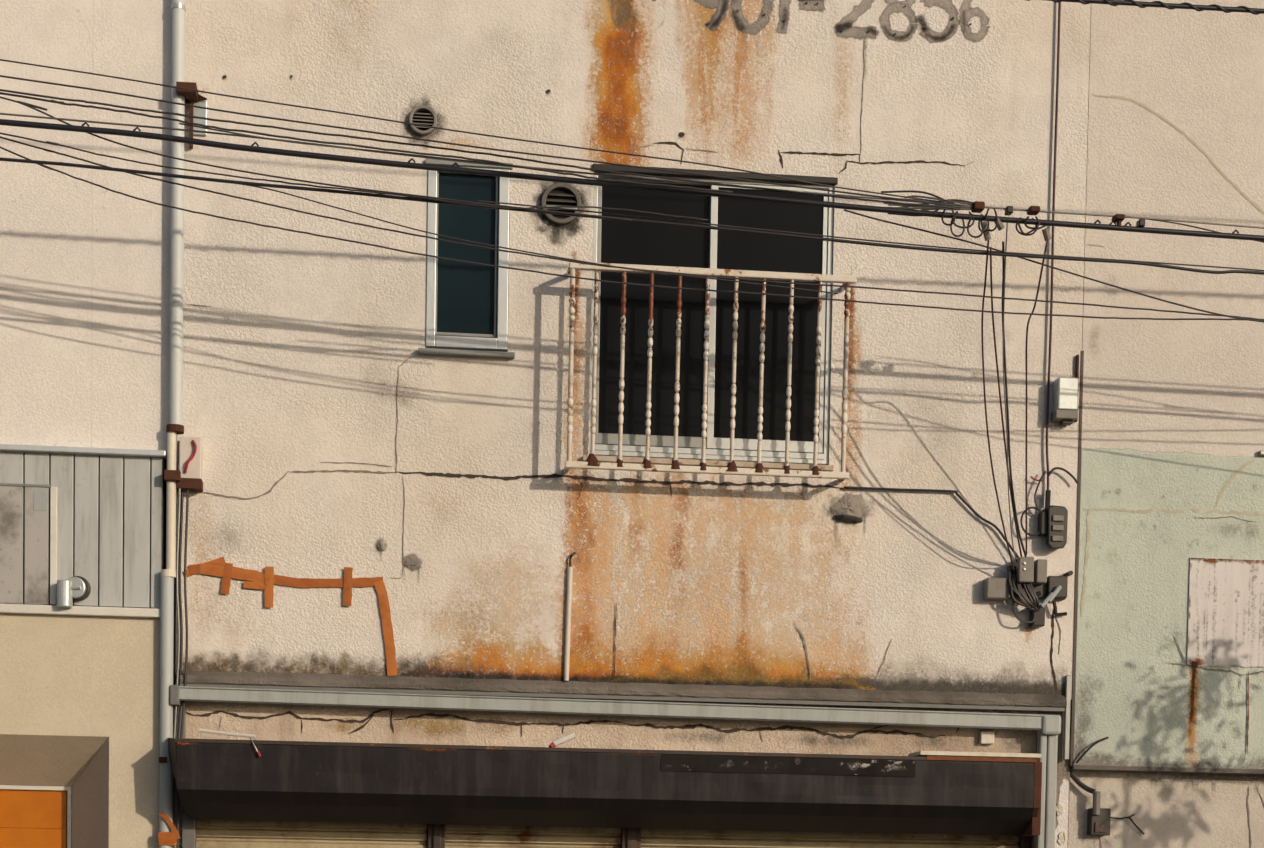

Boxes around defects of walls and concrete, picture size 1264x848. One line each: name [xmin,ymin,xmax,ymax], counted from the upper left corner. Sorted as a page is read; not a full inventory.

rust [588,0,649,166]
crack [638,142,714,160]
rust [687,0,773,148]
crack [778,38,974,174]
crack [1094,95,1264,214]
crack [203,355,840,579]
rust [399,270,870,689]
crack [1050,457,1264,692]
rust [1190,558,1264,568]
crack [186,709,959,742]
rust [1187,659,1203,768]
crack [1247,788,1264,848]